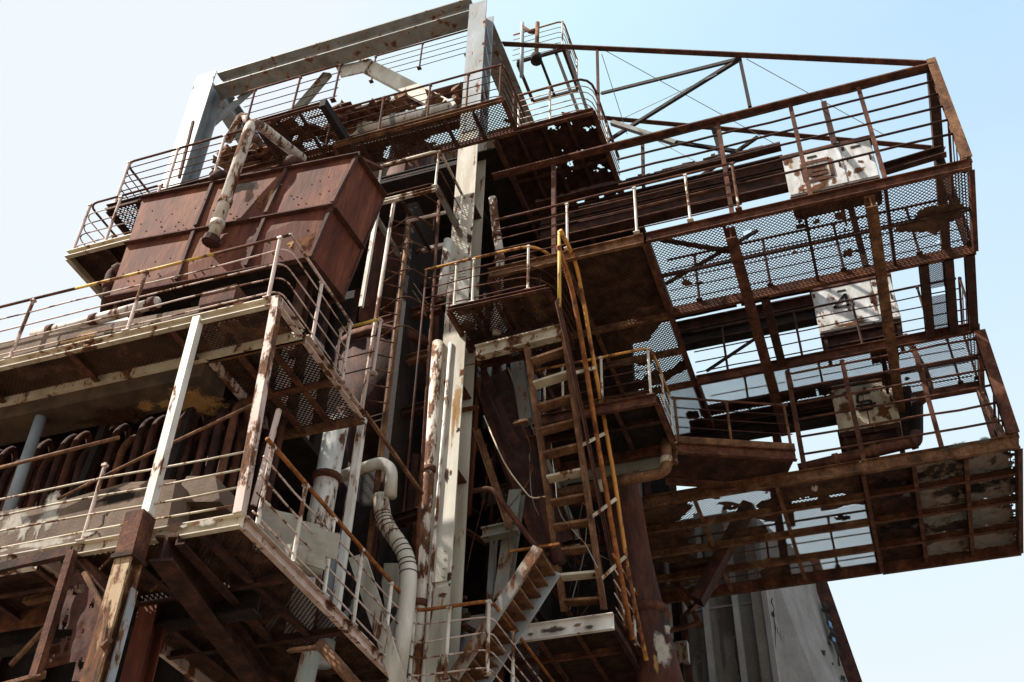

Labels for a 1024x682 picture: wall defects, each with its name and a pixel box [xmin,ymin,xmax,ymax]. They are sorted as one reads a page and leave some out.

corrosion [783,158,864,193]
corrosion [235,182,273,210]
corrosion [834,282,878,328]
corrosion [451,368,465,435]
corrosion [877,406,892,420]
peeling [938,437,992,451]
peeling [0,532,92,552]
peeling [654,626,671,672]